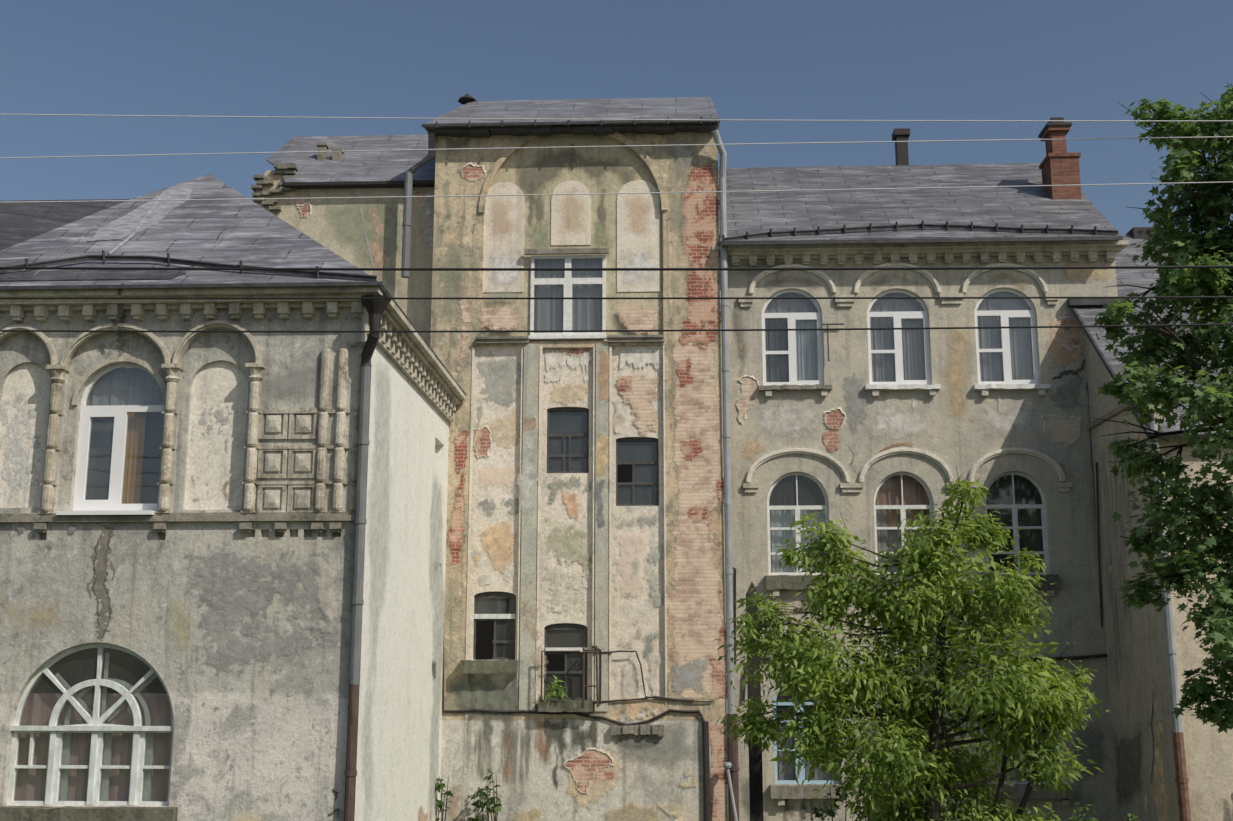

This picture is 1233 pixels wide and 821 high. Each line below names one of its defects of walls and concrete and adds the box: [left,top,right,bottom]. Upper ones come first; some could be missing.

spalling [460,162,487,183]
spalling [1046,314,1084,370]
peeling [446,293,522,586]
flaking render [545,161,727,722]
peeling [735,374,847,477]
peeling [982,397,1034,434]
crack [1052,359,1096,517]
crack [87,525,115,641]
leakage [430,482,687,821]
spalling [563,747,685,821]
flaking render [680,721,728,821]